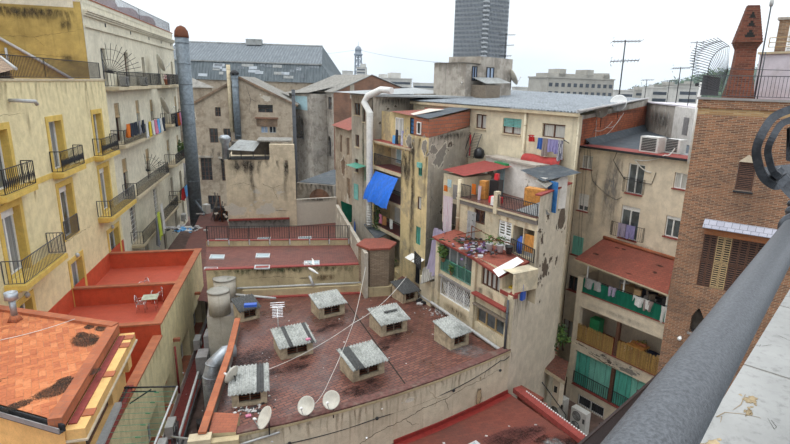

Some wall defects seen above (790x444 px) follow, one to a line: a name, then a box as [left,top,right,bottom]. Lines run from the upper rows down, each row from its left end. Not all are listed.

spalling [405,127,454,169]
spalling [537,208,566,288]